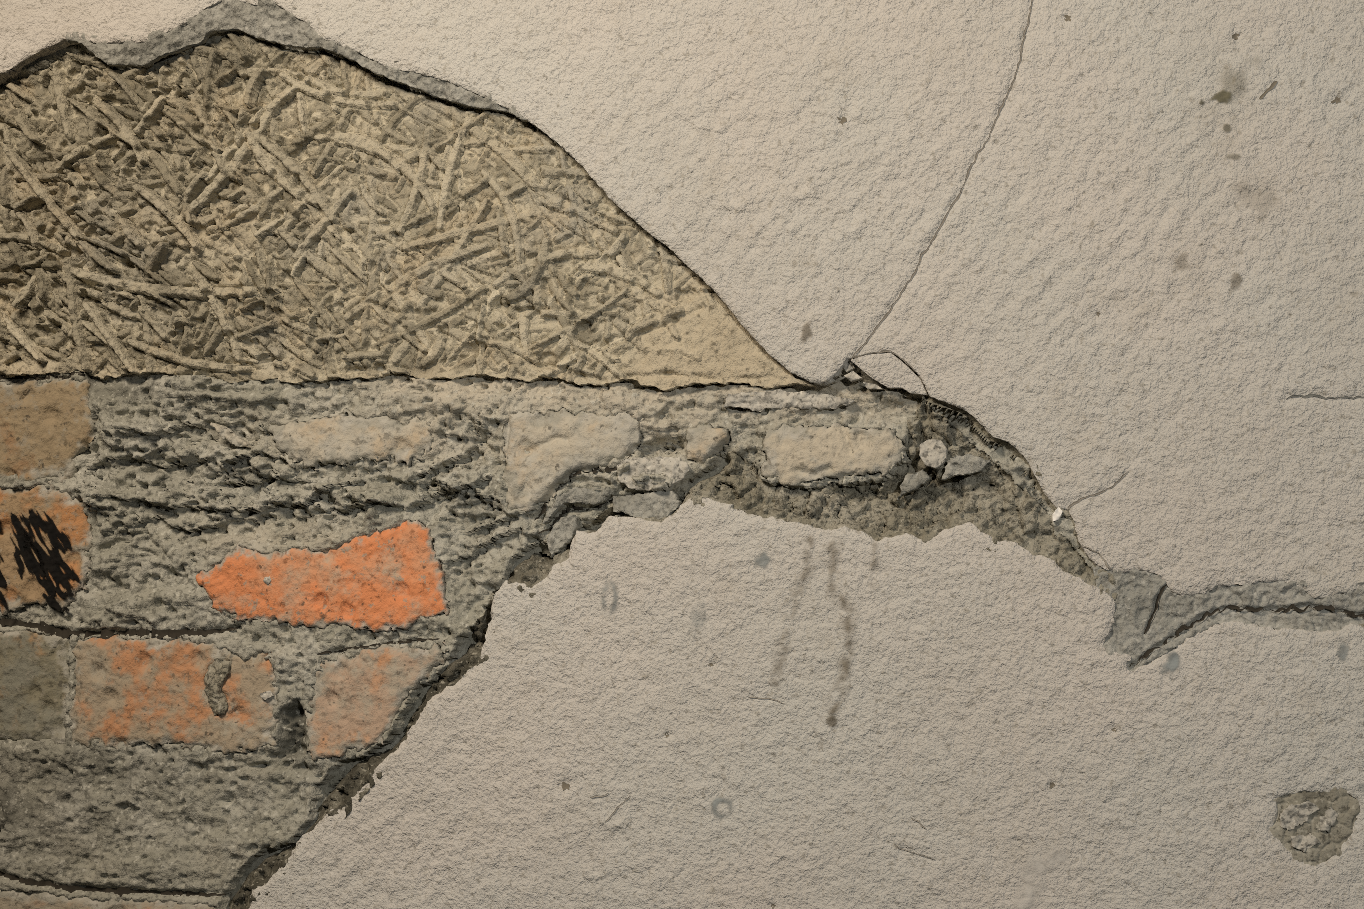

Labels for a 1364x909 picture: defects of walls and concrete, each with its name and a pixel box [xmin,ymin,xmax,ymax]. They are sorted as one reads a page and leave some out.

spalling [9,0,541,131]
crack [849,0,1033,372]
crack [1286,392,1364,400]
spalling [0,32,1099,909]
spalling [1093,565,1364,671]
peeling [1270,787,1360,866]